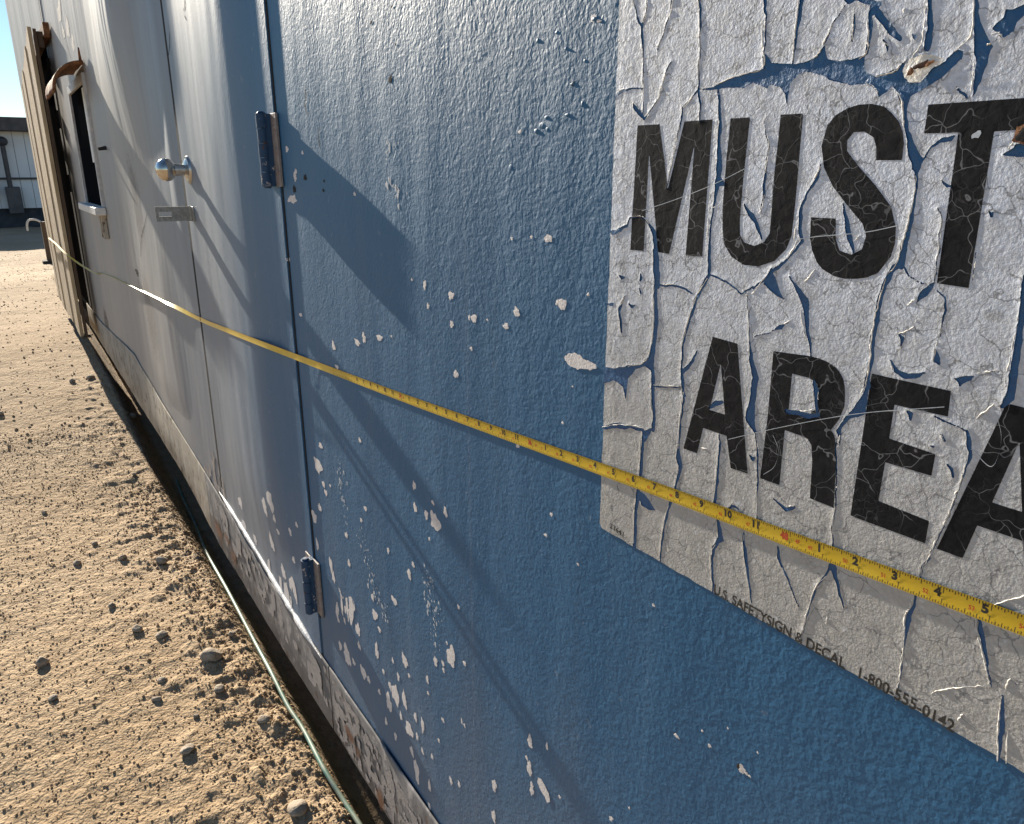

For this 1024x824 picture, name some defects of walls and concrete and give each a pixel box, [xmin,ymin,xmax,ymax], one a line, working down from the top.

rust [903,53,943,83]
peeling [564,353,596,370]
crack [602,0,1024,702]
peeling [311,442,331,523]
peeling [412,481,448,541]
peeling [204,452,298,651]
peeling [307,557,433,824]
peeling [426,641,466,695]
peeling [525,734,561,803]